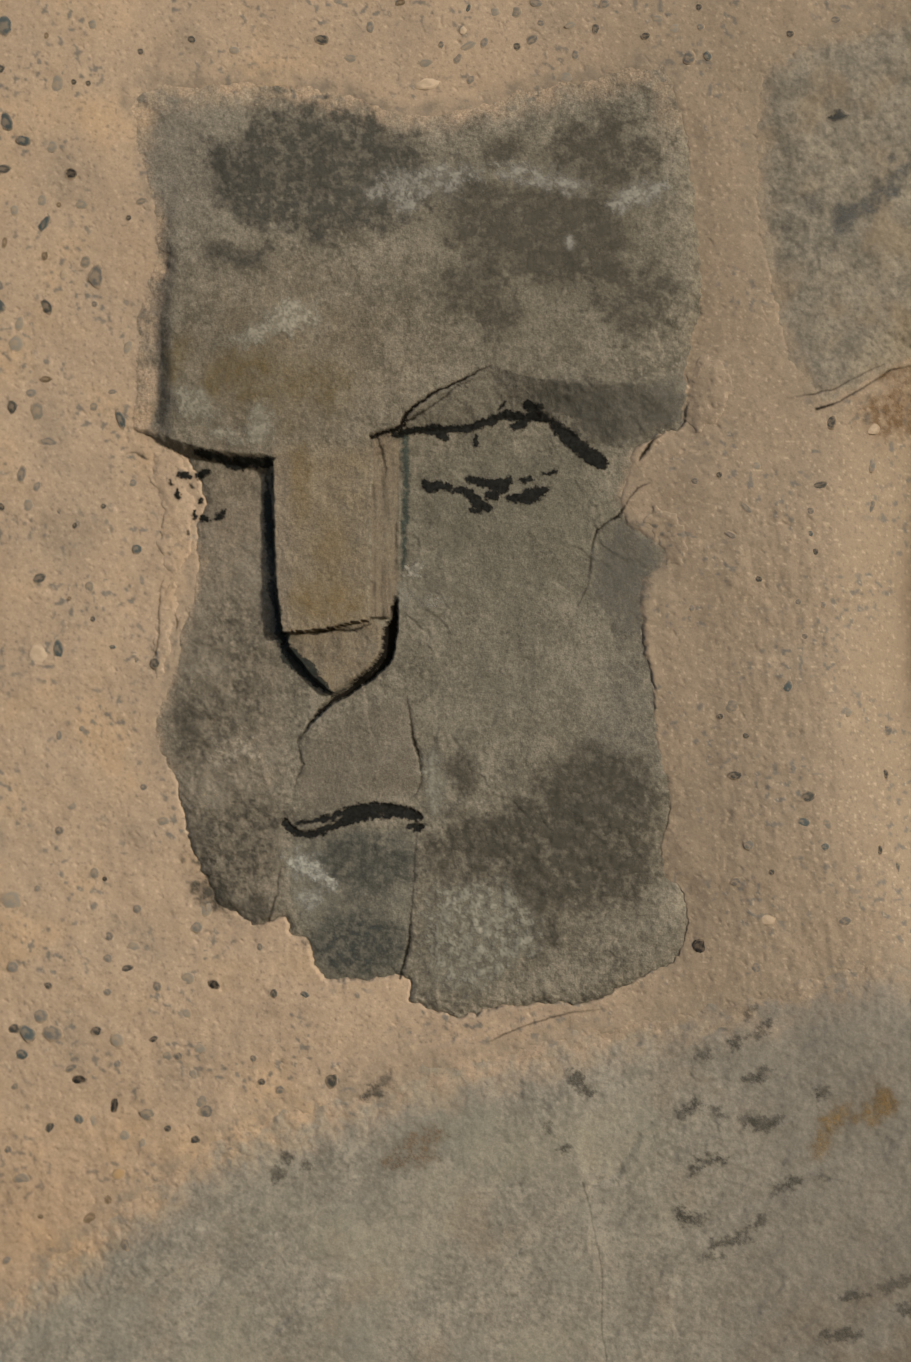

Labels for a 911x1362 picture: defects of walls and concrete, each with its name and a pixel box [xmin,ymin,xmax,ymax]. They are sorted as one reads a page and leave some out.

crack [590,507,625,572]